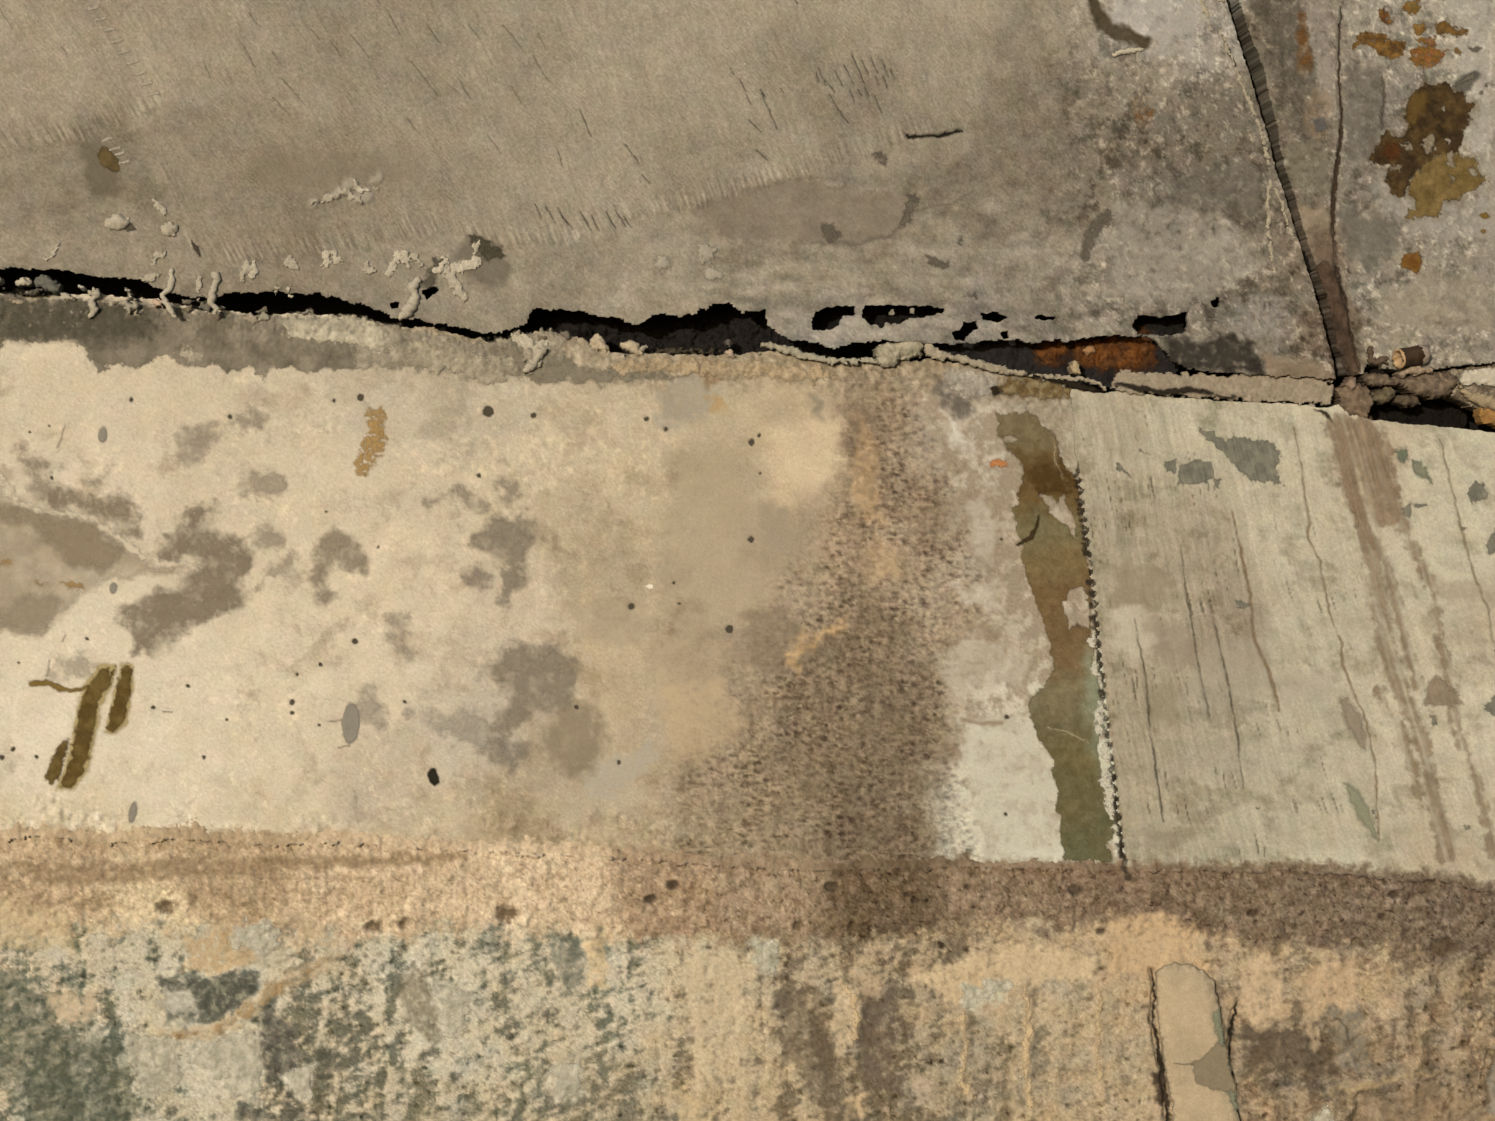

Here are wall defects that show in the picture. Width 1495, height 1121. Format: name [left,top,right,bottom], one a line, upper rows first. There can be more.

rust [1352,0,1489,220]
crack [0,267,528,343]
peeling [468,235,506,261]
spalling [519,303,944,375]
crack [807,310,951,363]
peeling [923,230,1389,406]
rust [1401,251,1422,274]
crack [1019,7,1403,835]
water stain [452,485,533,603]
water stain [0,459,292,789]
water stain [436,645,575,768]
crack [1150,968,1241,1121]